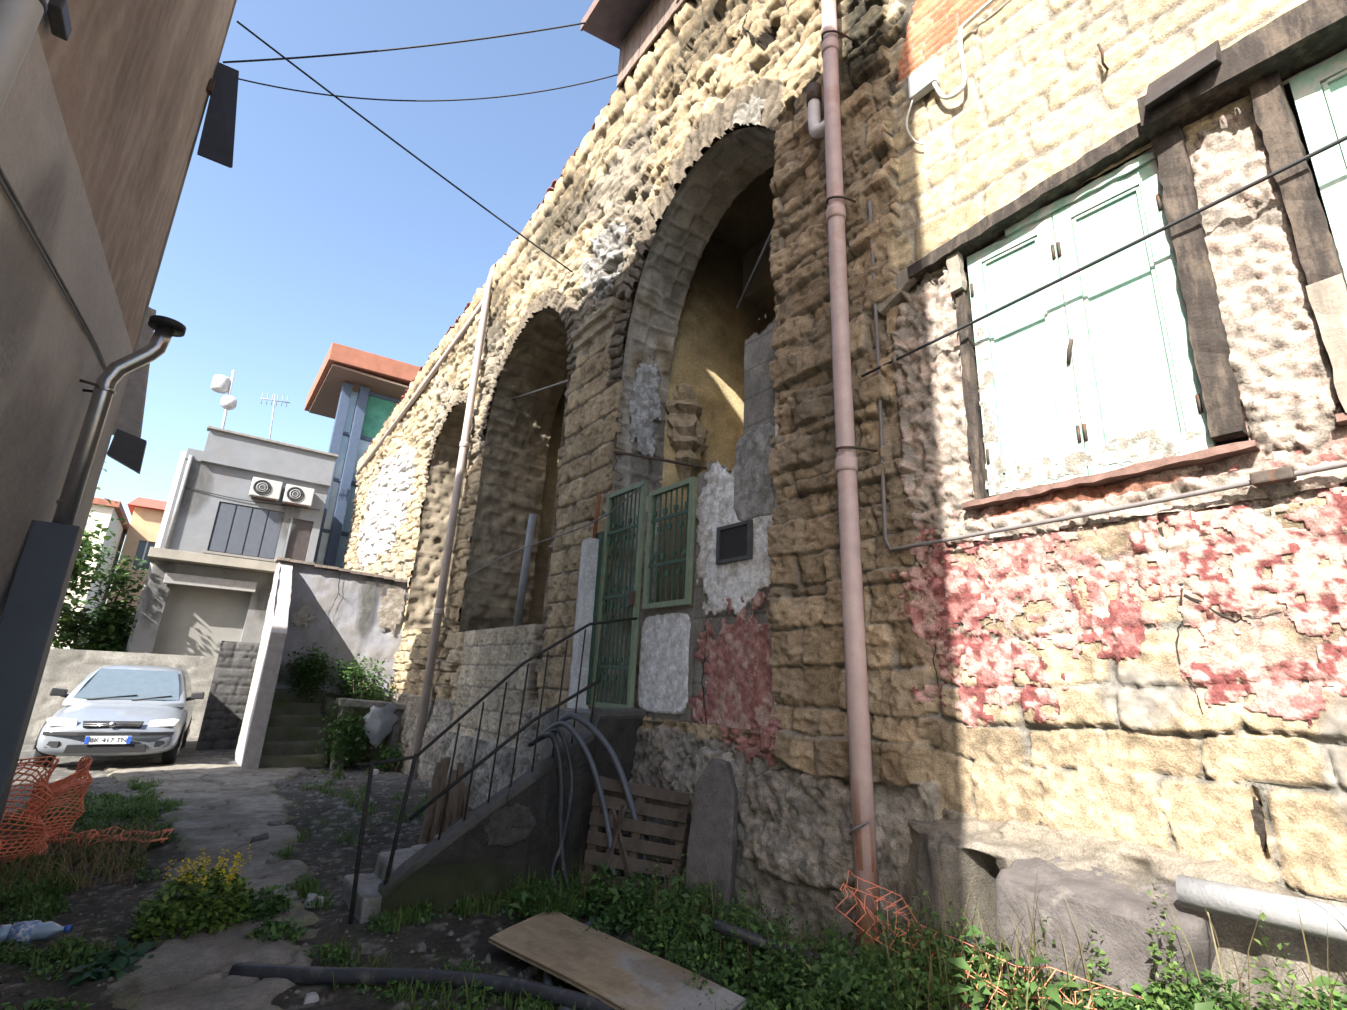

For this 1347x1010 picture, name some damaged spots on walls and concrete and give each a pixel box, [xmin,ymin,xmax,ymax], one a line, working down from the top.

flaking render [889,107,1347,728]
peeling [689,460,783,767]
crack [1175,583,1281,714]